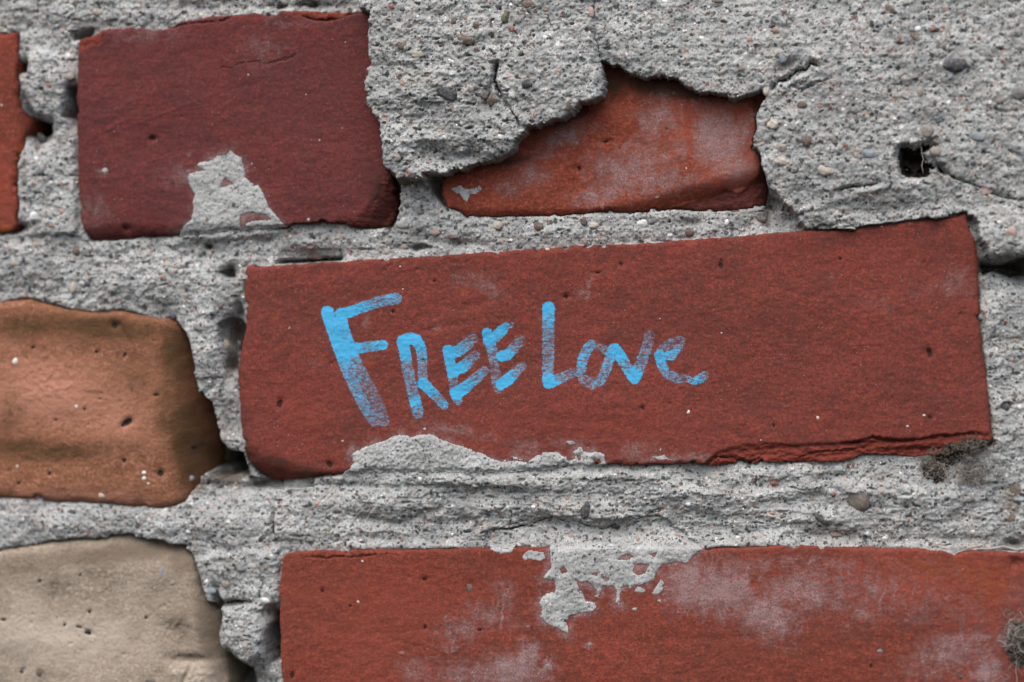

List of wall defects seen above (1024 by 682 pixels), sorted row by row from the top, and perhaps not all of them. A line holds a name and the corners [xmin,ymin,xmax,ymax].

crack [493,63,520,126]
spalling [679,169,767,210]
spalling [710,434,992,465]
damp [621,549,896,639]
damp [904,621,1009,682]